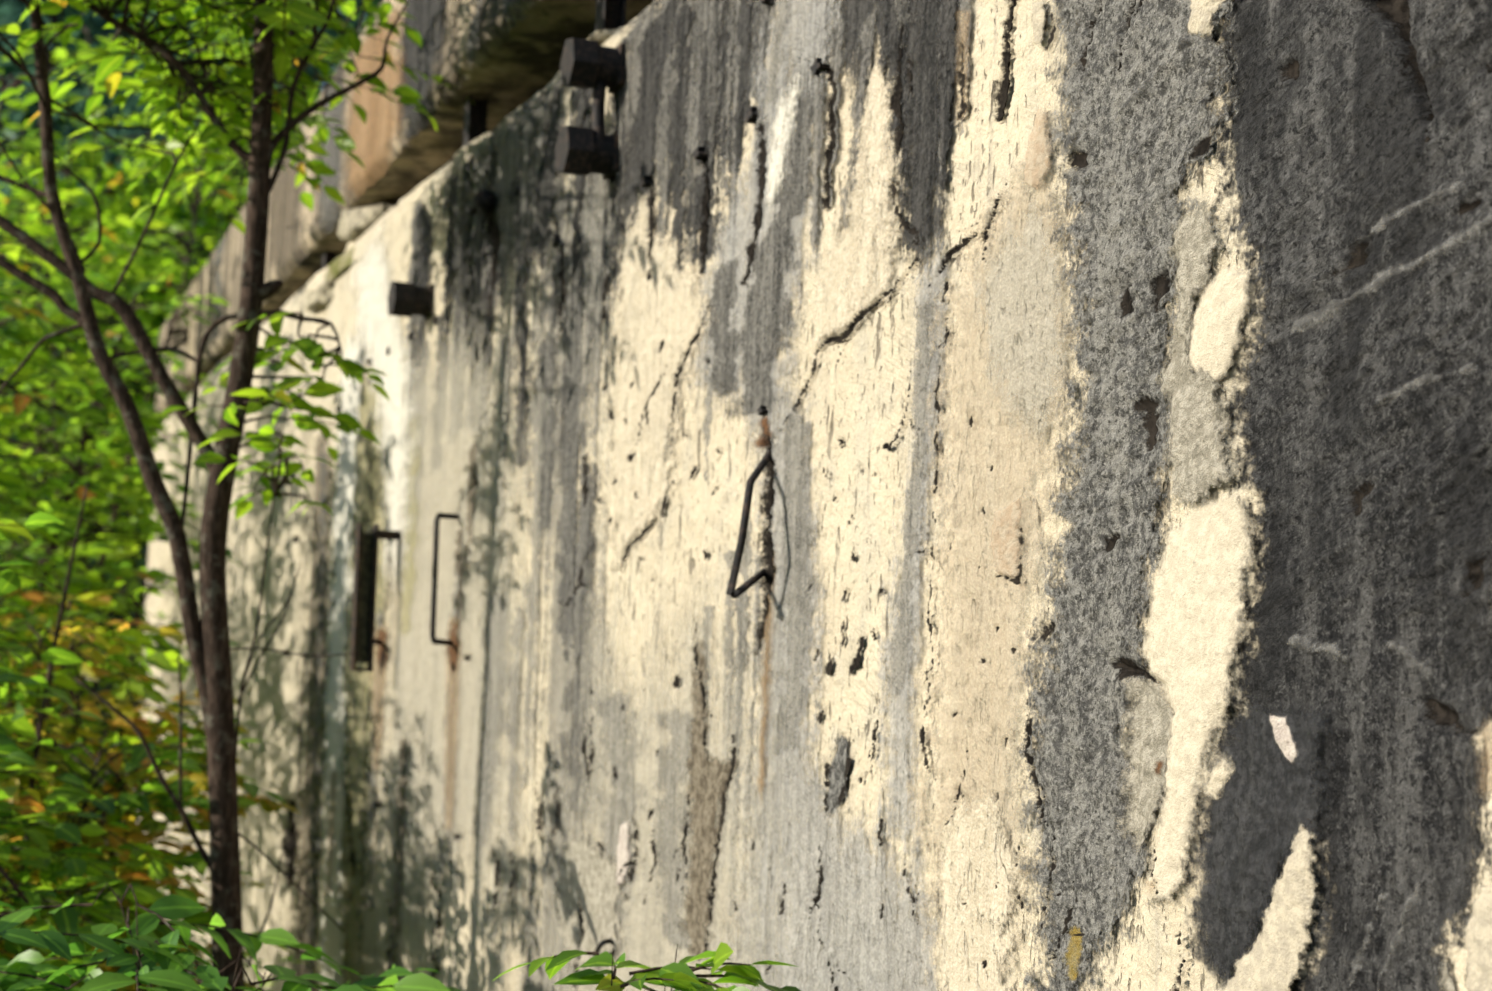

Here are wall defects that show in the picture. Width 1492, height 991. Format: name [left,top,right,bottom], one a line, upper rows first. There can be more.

leakage [190,453,209,621]
leakage [226,0,1069,991]
crack [775,179,1007,825]
leakage [182,653,207,752]
leakage [176,807,211,911]
leakage [190,930,212,966]
leakage [1186,703,1329,990]
leakage [1460,738,1487,917]